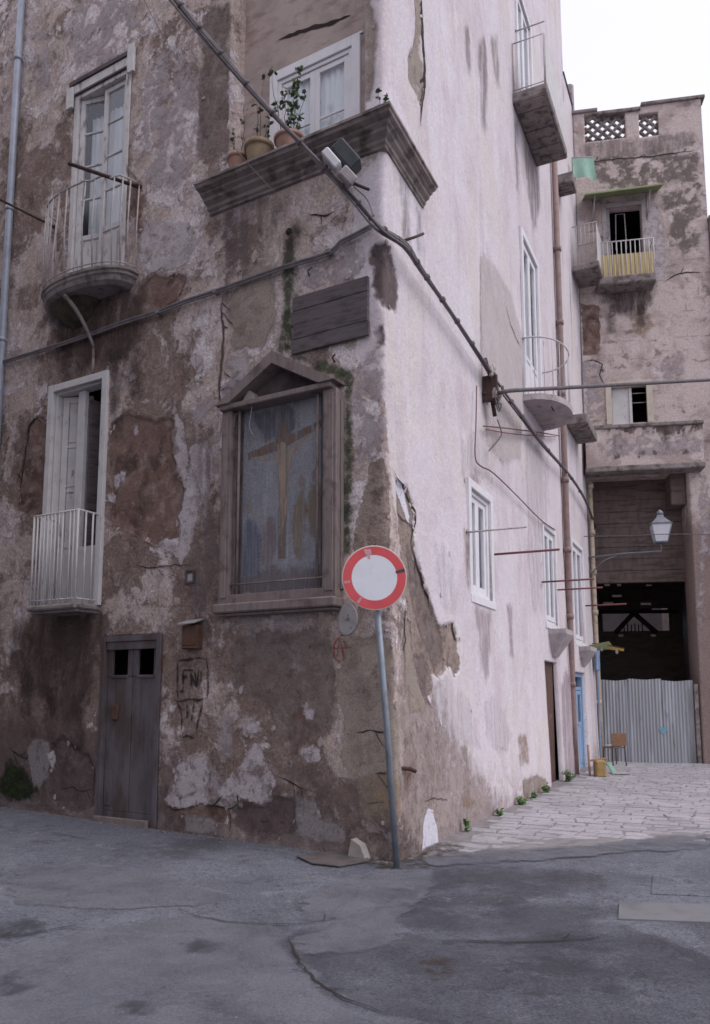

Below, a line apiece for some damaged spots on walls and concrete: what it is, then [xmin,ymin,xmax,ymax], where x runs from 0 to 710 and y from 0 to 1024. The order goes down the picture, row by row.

crack [279,15,350,40]
spalling [408,0,424,105]
spalling [369,239,398,310]
crack [218,292,237,402]
spalling [580,303,605,417]
spalling [106,406,202,565]
spalling [348,326,461,703]
spalling [31,736,95,813]
spalling [165,716,297,840]